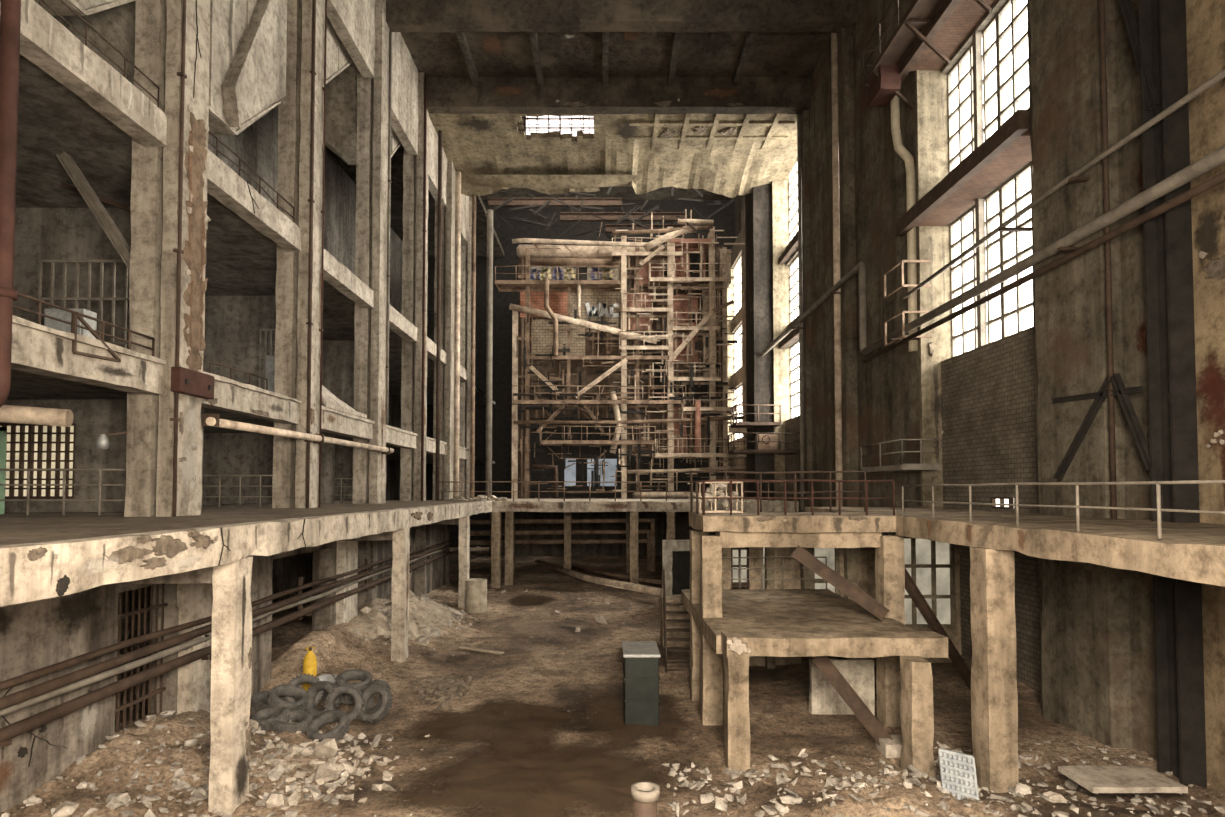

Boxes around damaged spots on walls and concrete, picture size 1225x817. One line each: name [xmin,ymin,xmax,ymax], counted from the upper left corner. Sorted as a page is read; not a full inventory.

rust [189,131,205,343]
spalling [102,529,219,570]